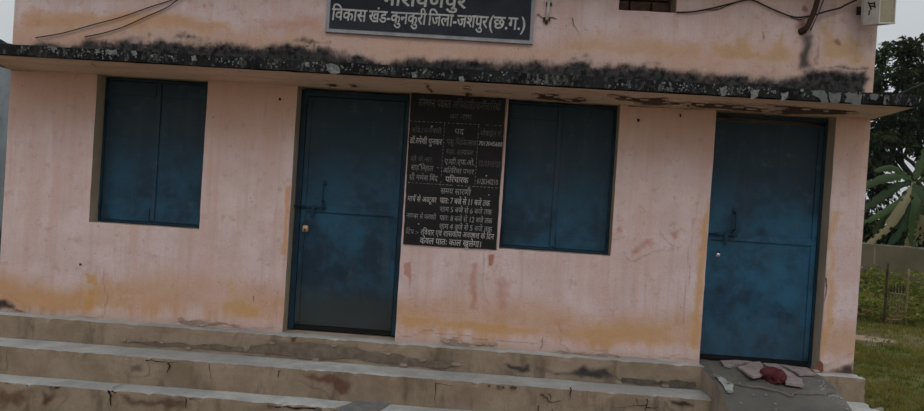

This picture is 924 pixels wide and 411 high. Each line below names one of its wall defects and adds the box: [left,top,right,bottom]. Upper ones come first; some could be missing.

leakage [13,0,877,93]
peeling [607,82,890,116]
leakage [0,293,29,313]
leakage [209,268,276,330]
leakage [396,257,548,343]
leakage [497,190,710,384]
crack [538,387,572,411]